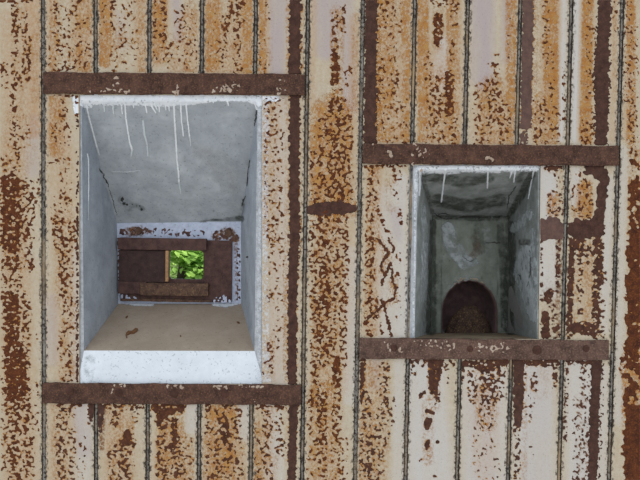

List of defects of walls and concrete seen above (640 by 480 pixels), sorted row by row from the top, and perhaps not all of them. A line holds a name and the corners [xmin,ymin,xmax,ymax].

water stain [103,103,134,158]
water stain [144,103,191,194]
corrosion [363,0,460,144]
corrosion [472,0,566,145]
corrosion [0,0,40,480]
corrosion [47,94,79,382]
corrosion [254,0,357,480]
water stain [418,168,503,335]
corrosion [540,166,610,340]
corrosion [579,0,640,480]
corrosion [54,404,194,480]
corrosion [410,359,604,480]